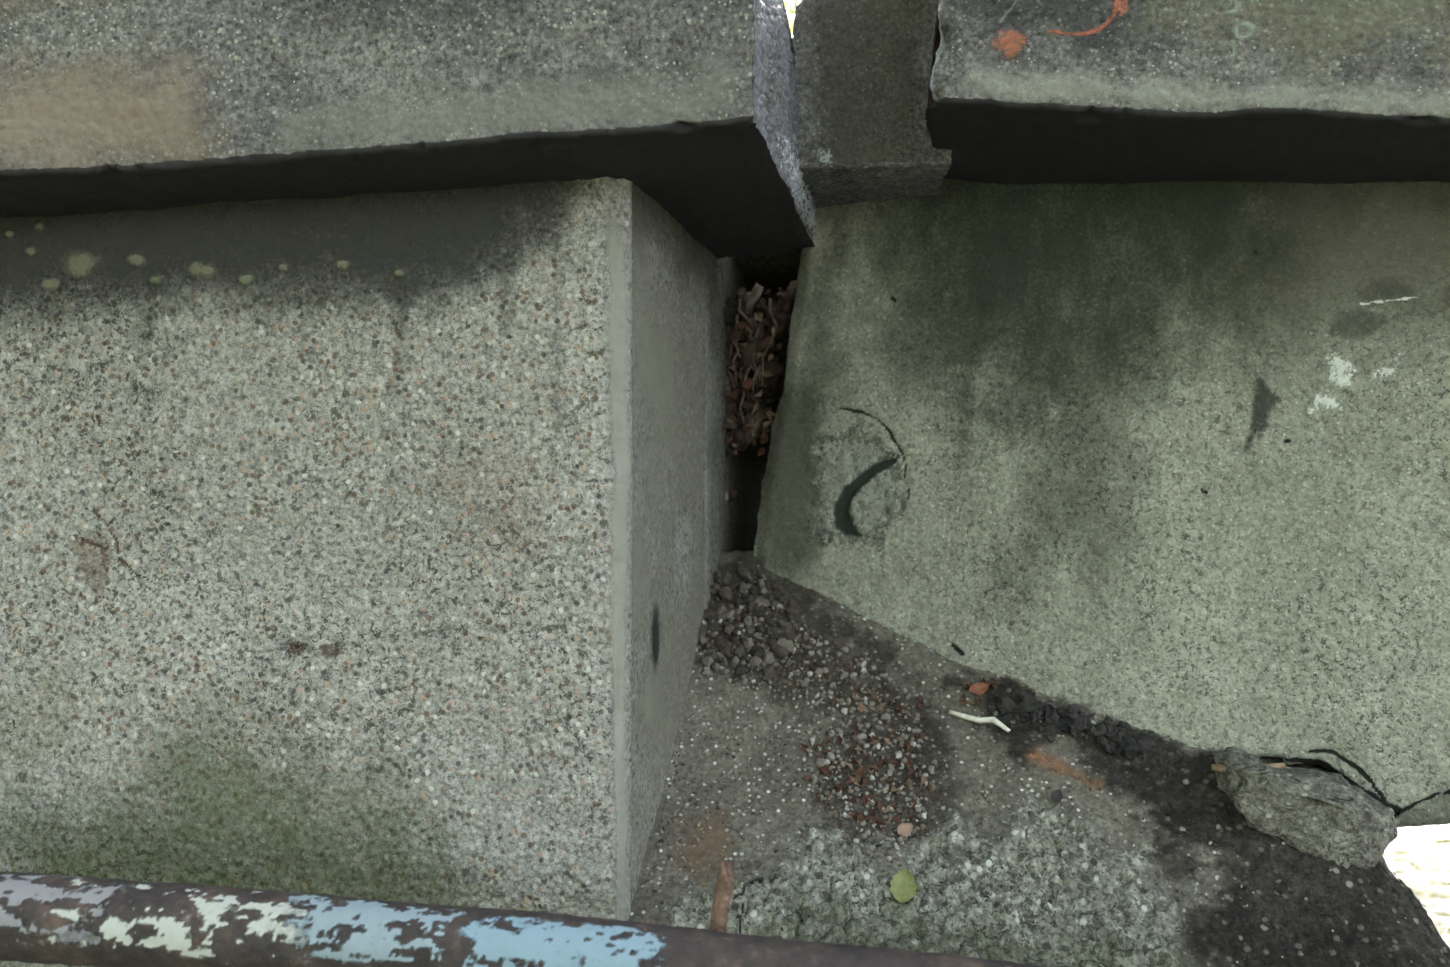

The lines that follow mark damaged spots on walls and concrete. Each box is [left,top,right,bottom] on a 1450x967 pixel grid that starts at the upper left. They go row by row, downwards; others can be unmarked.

water stain [870,178,1286,424]
crack [1260,749,1450,819]